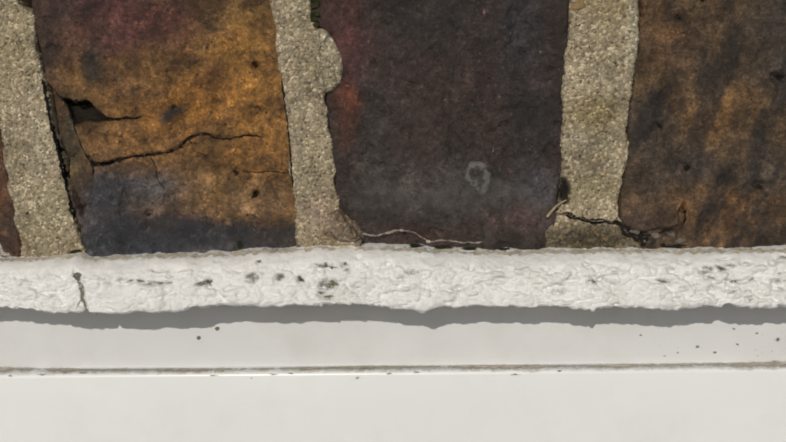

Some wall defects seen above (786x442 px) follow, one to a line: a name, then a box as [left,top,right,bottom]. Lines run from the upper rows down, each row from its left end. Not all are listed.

spalling [56,93,109,170]
crack [100,113,142,121]
crack [89,132,265,191]
crack [563,212,688,248]
crack [72,273,97,316]